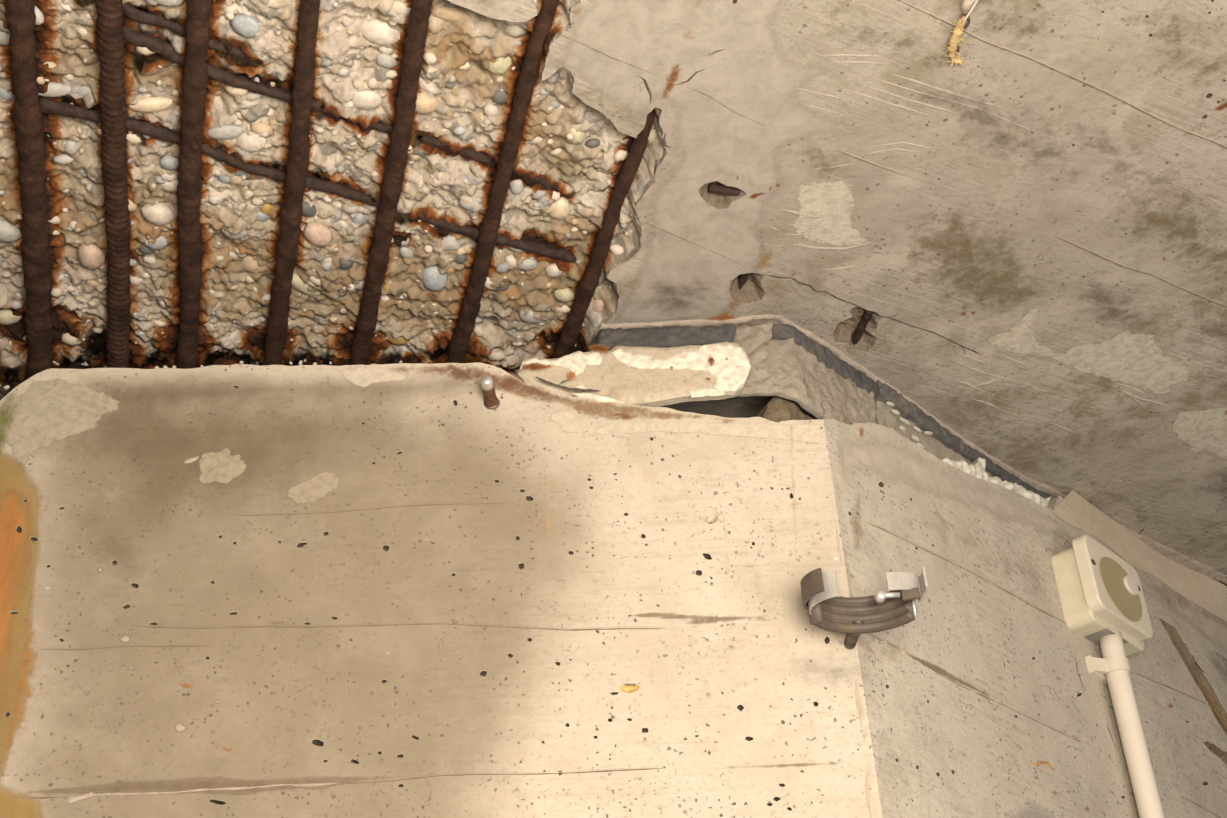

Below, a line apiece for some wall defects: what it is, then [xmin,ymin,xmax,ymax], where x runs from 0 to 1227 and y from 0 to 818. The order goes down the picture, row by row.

rust [0,299,28,395]
rust [33,0,108,369]
spalling [35,0,108,369]
spalling [123,0,186,369]
rust [122,0,188,369]
rust [196,0,300,368]
spalling [200,0,300,367]
rust [282,0,412,365]
spalling [283,0,411,366]
spalling [368,0,541,365]
rust [368,0,649,397]
spalling [464,65,700,419]